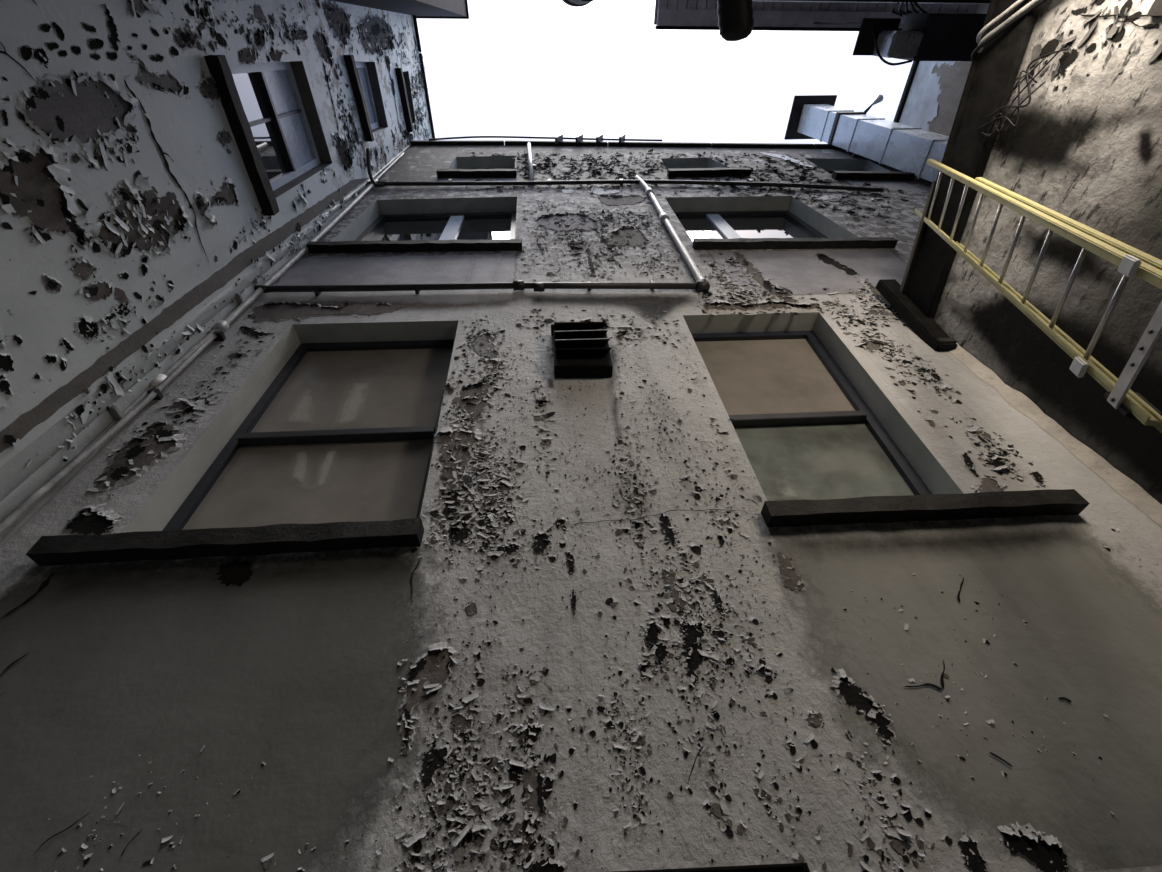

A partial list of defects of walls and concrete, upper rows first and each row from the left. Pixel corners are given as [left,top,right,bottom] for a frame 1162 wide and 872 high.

peeling [0,0,429,535]
peeling [465,149,1046,493]
peeling [388,305,988,872]
peeling [58,755,166,869]
spalling [997,822,1069,872]